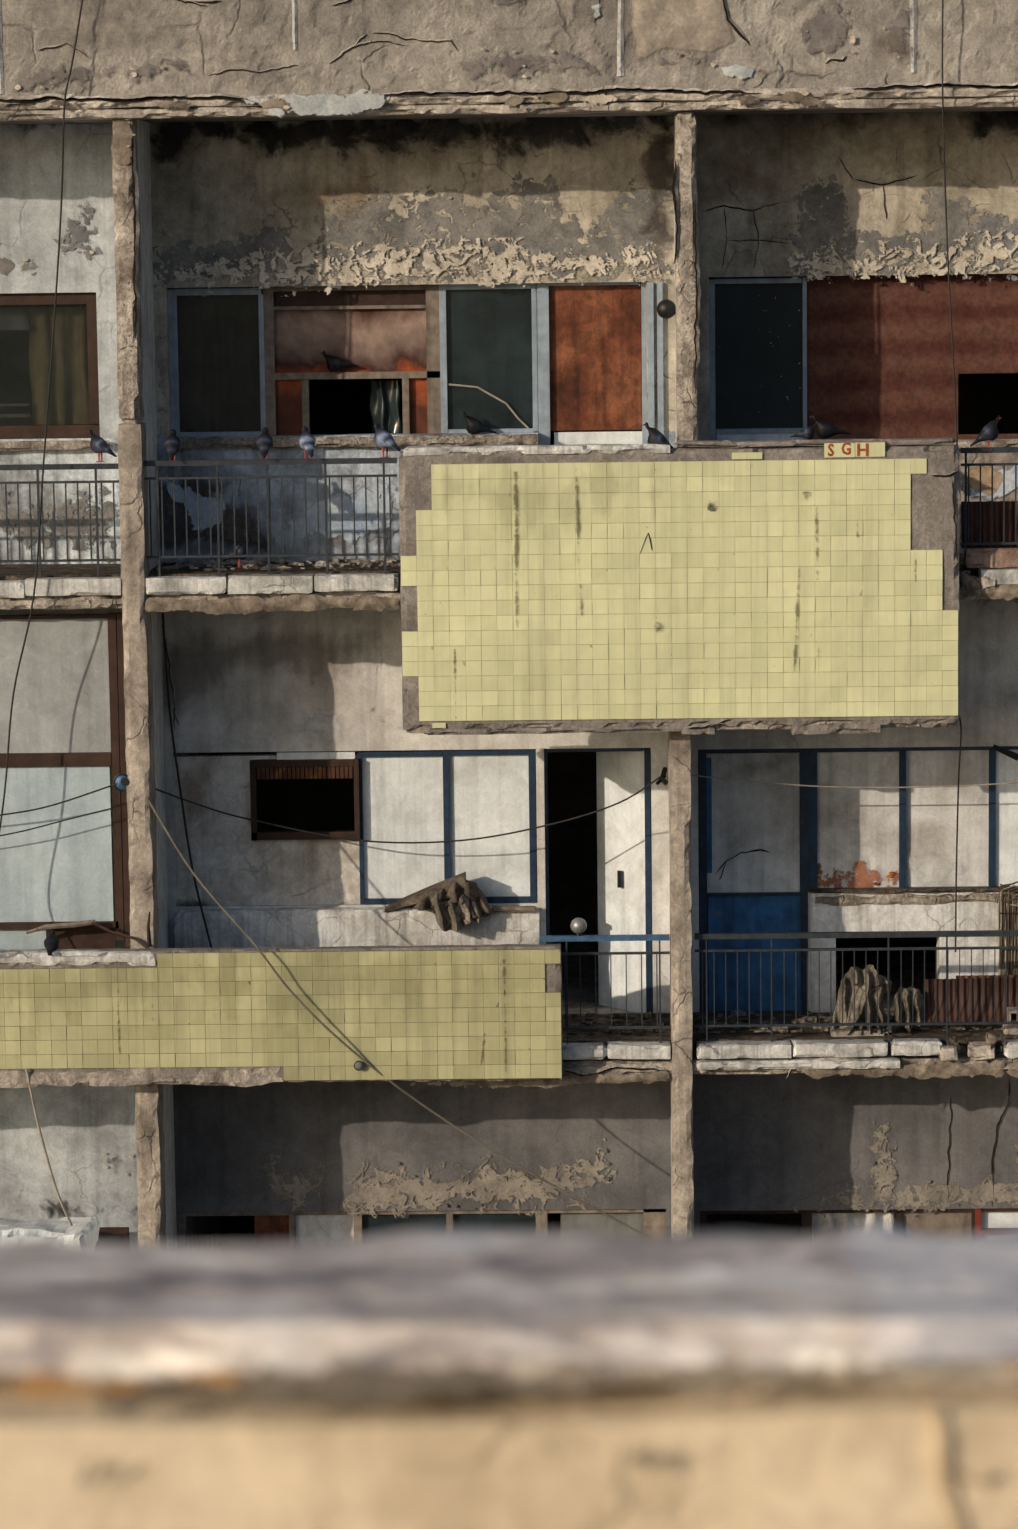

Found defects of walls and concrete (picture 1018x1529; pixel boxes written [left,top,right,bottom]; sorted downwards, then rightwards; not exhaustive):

crack [178,0,221,8]
crack [723,0,750,46]
crack [372,85,758,96]
crack [826,56,1018,90]
crack [0,31,458,338]
crack [839,158,917,219]
peeling [152,171,675,297]
peeling [784,174,1018,286]
rust [817,860,899,888]
spalling [795,1031,1018,1080]
crack [945,1099,953,1198]
crack [959,1063,1018,1207]